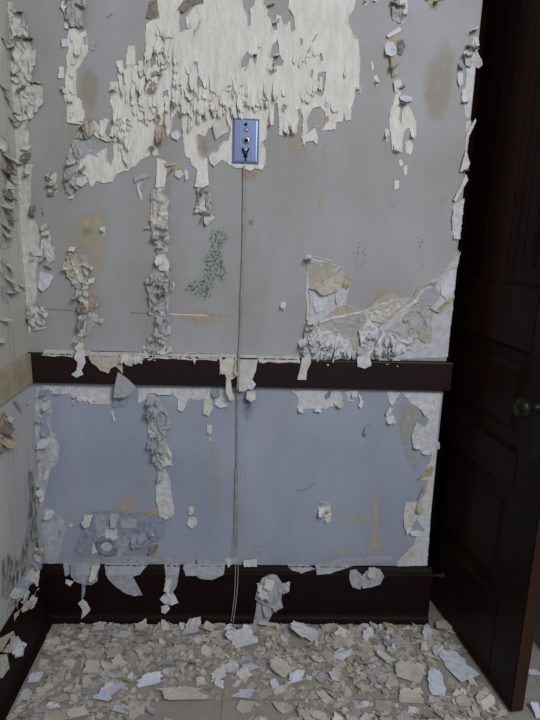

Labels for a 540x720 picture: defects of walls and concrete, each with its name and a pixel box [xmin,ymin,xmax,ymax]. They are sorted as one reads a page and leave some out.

peeling [451,26,483,239]
water stain [189,231,225,297]
peeling [0,0,461,625]
peeling [0,631,27,678]